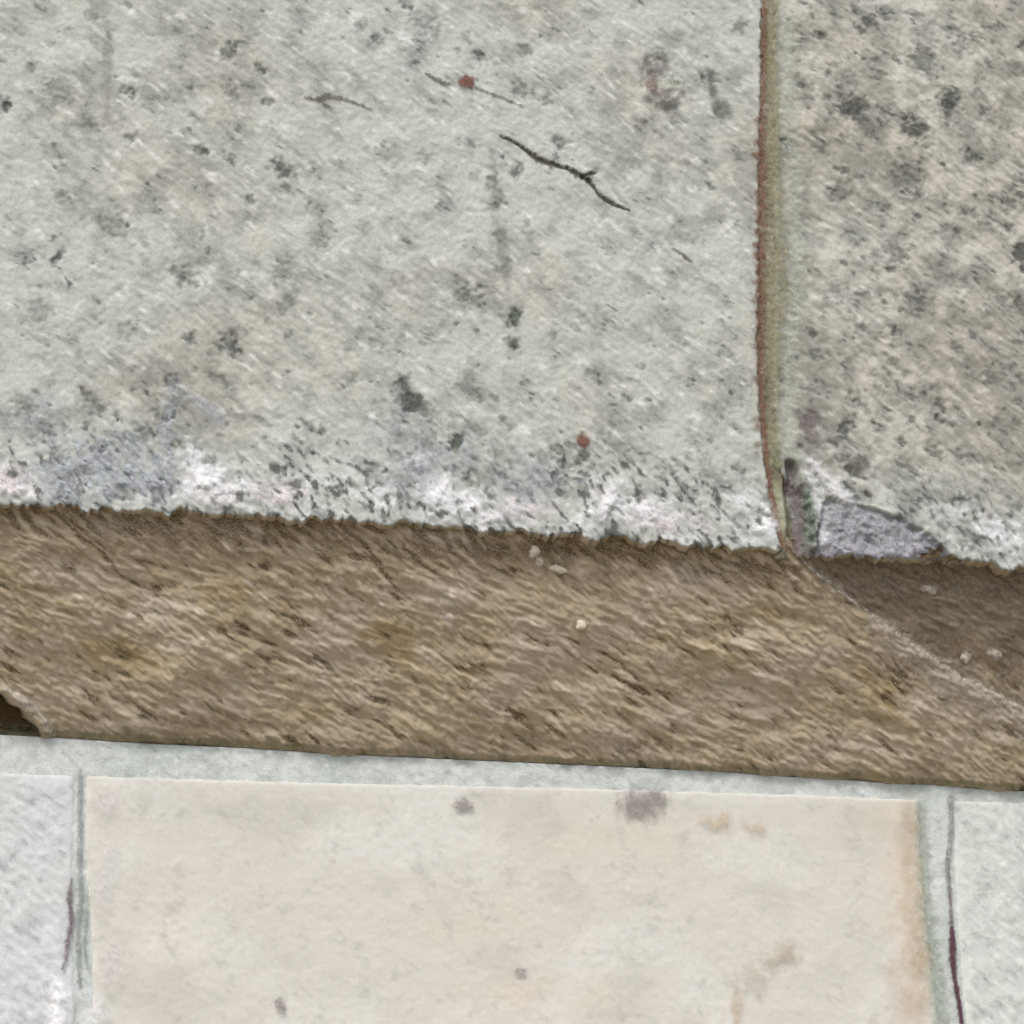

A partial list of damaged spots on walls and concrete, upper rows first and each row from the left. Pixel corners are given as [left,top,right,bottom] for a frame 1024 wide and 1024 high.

crack [501,137,629,211]
rust [753,0,786,549]
spalling [0,686,56,736]